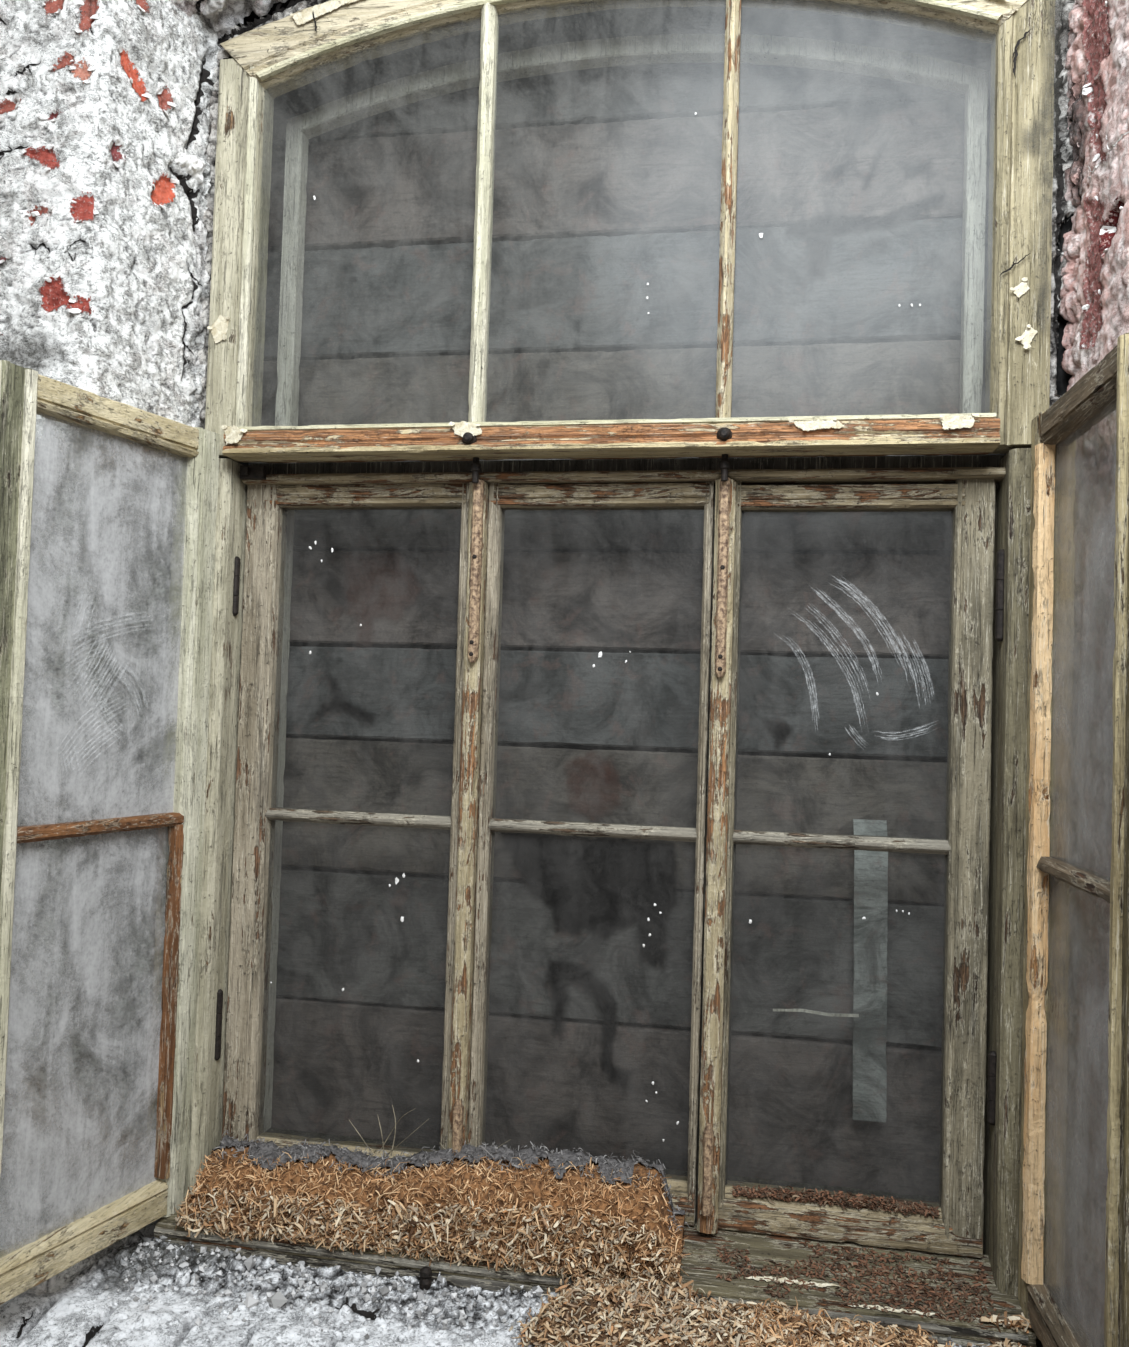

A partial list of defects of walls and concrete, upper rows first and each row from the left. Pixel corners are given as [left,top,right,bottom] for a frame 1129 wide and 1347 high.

peeling [202,0,227,27]
spalling [118,45,176,115]
crack [170,0,319,232]
spalling [1081,0,1112,164]
spalling [151,155,206,209]
spalling [39,277,94,316]
crack [181,267,203,379]
spalling [1067,193,1124,350]